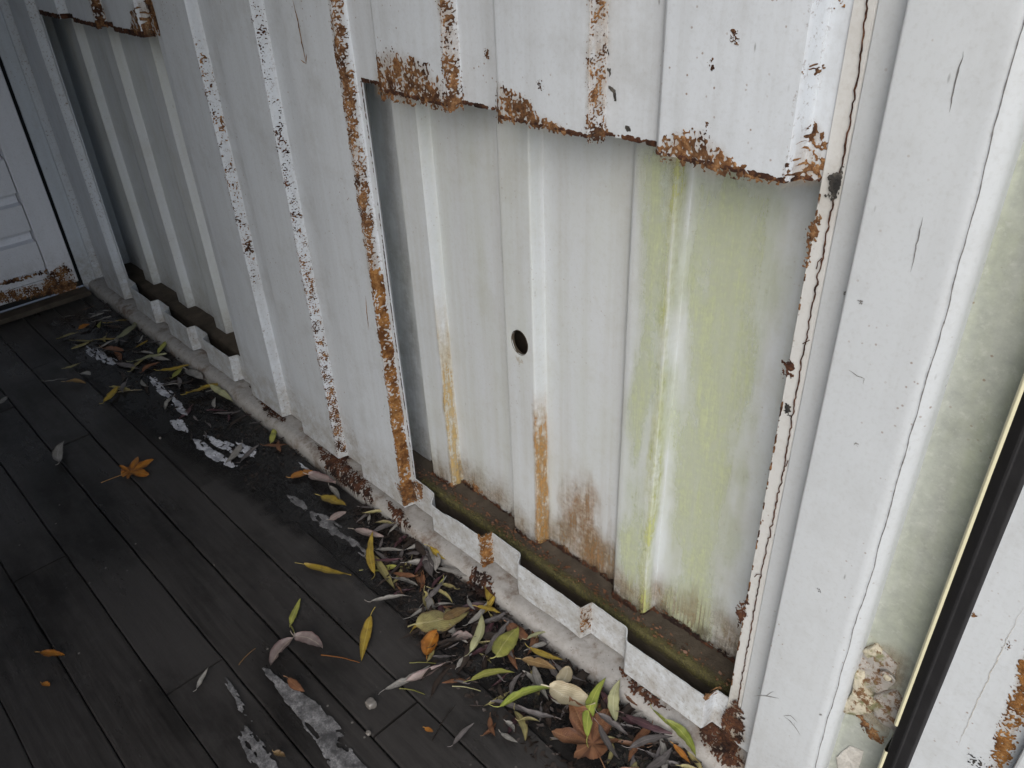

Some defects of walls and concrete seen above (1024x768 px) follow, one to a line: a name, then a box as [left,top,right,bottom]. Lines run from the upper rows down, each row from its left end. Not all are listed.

rust [0,263,77,303]
rust [193,31,259,284]
rust [250,1,373,504]
damp [47,308,594,730]
rust [328,0,828,531]
rust [431,416,754,702]
crack [733,0,1024,768]
damp [566,717,659,768]
rust [699,700,747,768]
rust [989,659,1024,768]